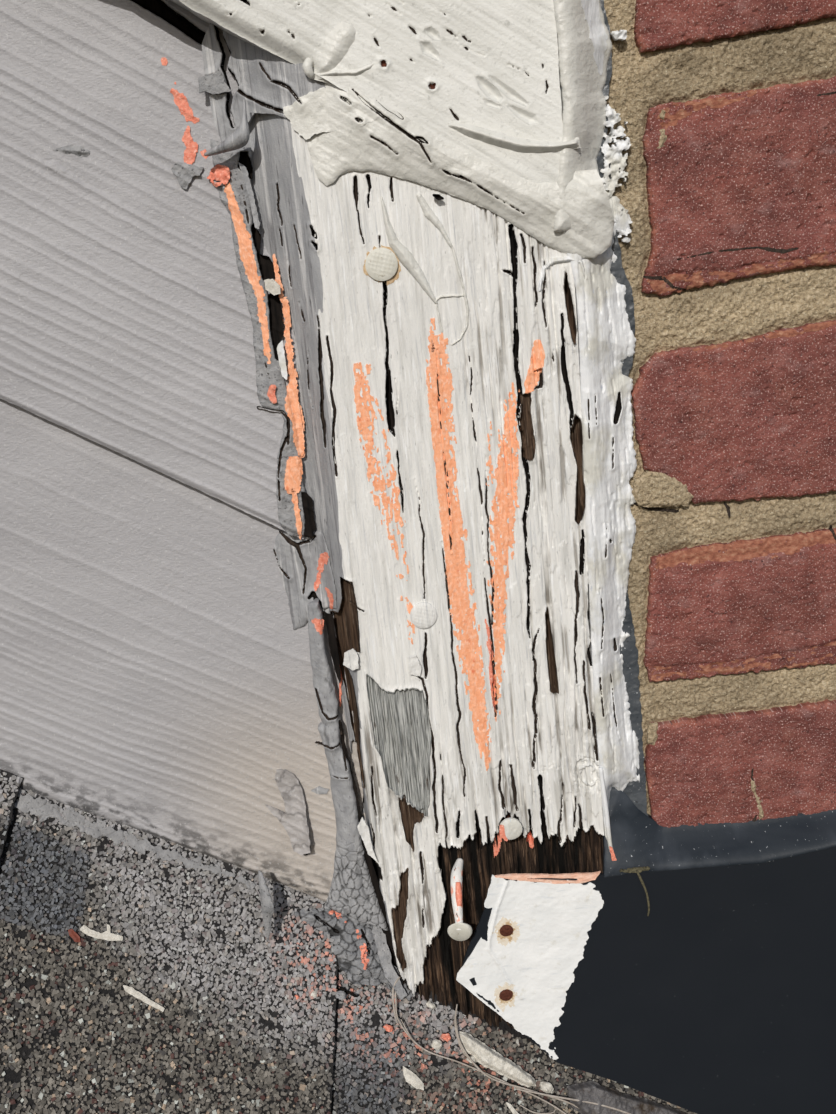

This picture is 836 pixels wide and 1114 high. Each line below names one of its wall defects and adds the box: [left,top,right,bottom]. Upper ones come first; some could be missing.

crack [368,7,417,61]
peeling [264,279,281,295]
peeling [277,340,288,380]
crack [257,406,290,501]
crack [340,88,622,928]
crack [274,530,324,614]
crack [315,688,377,848]
peeling [343,648,431,852]
peeling [357,817,378,862]
peeling [392,868,408,971]
rust [492,917,520,947]
rust [494,982,517,1012]